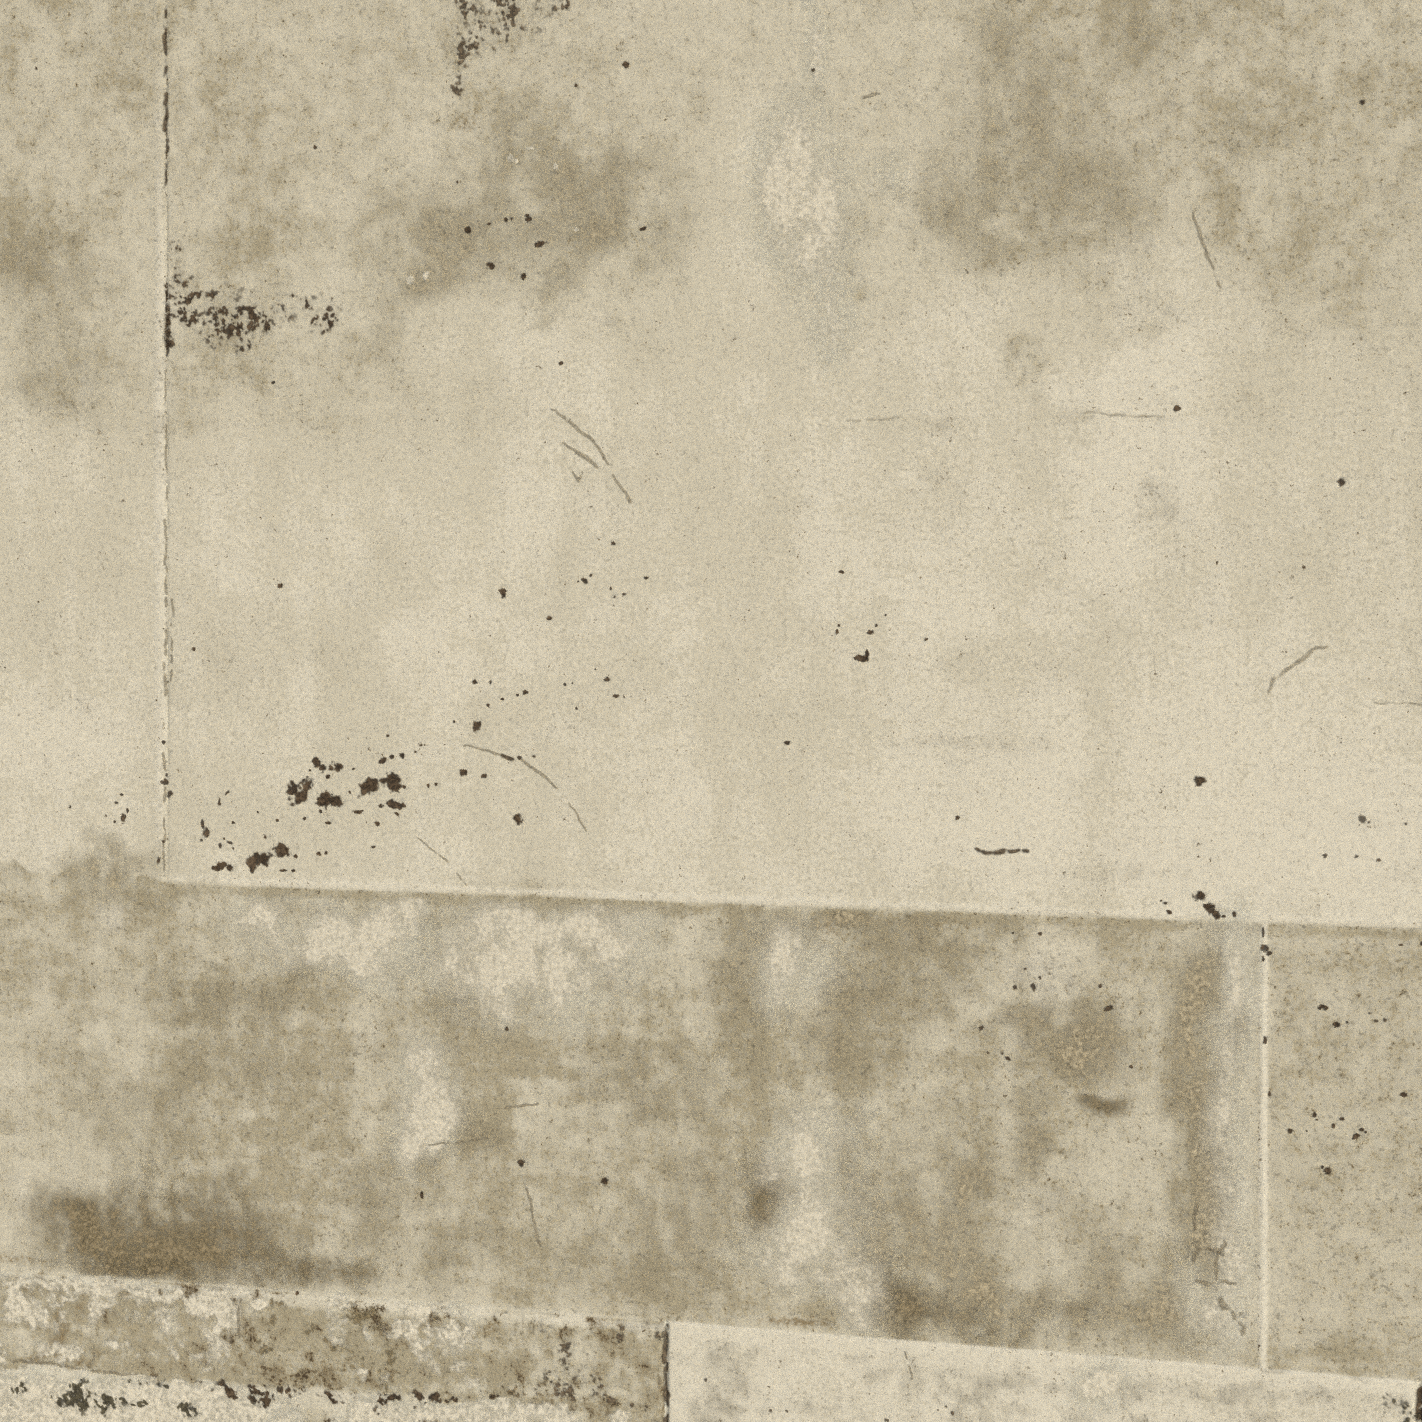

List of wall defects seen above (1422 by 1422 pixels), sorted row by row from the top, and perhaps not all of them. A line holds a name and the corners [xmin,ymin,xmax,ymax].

spalling [200,819,298,873]
spalling [286,751,417,826]
damp [236,898,651,1029]
damp [397,1040,493,1167]
damp [724,911,889,1067]
damp [1005,1006,1124,1081]
damp [1069,934,1250,1336]
damp [757,1110,1046,1332]
peeling [0,1272,303,1422]
peeling [341,1304,580,1422]
peeling [609,1409,631,1422]